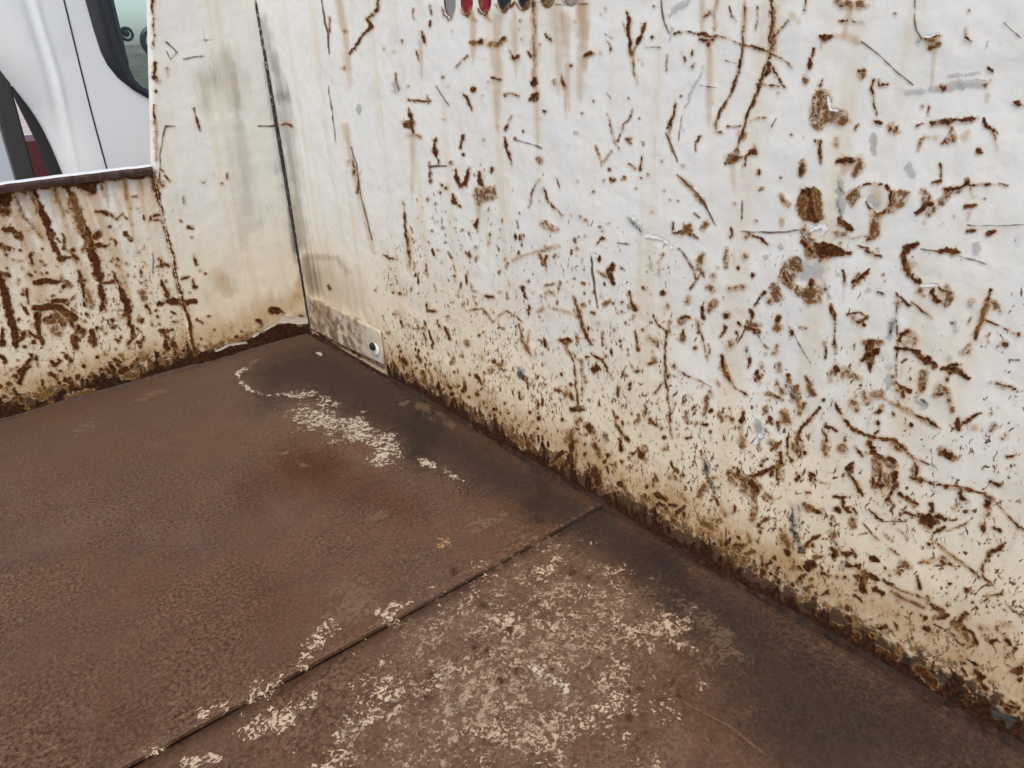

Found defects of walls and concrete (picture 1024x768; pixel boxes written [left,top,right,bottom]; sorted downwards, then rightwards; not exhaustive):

corrosion [834,0,870,23]
corrosion [441,0,587,113]
corrosion [924,32,941,51]
corrosion [152,61,160,160]
corrosion [809,89,848,143]
corrosion [929,116,976,144]
corrosion [0,132,1024,743]